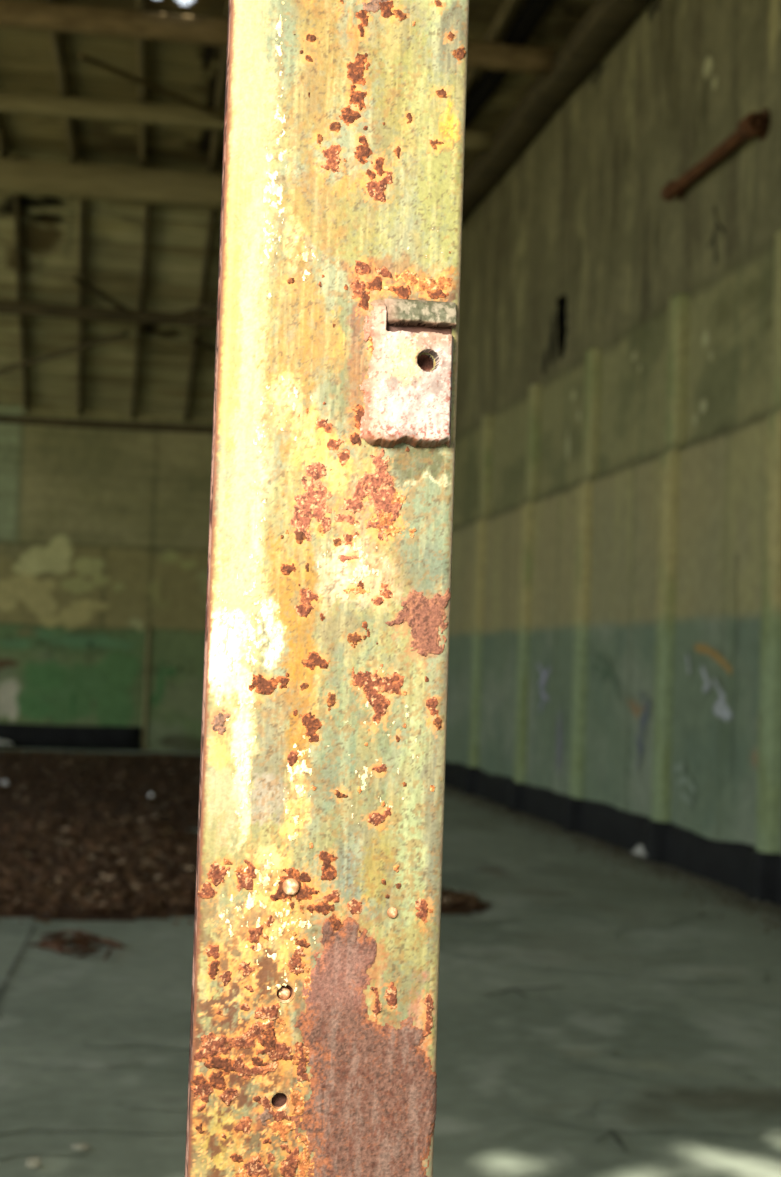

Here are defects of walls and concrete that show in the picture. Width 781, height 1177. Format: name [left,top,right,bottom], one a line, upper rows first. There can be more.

corrosion [355,0,415,37]
corrosion [295,34,316,62]
corrosion [317,53,401,202]
corrosion [344,260,452,310]
corrosion [281,385,416,562]
corrosion [343,581,451,657]
corrosion [248,672,309,695]
corrosion [293,692,336,743]
corrosion [302,651,330,670]
corrosion [351,664,407,746]
corrosion [287,750,298,766]
corrosion [190,843,437,1177]